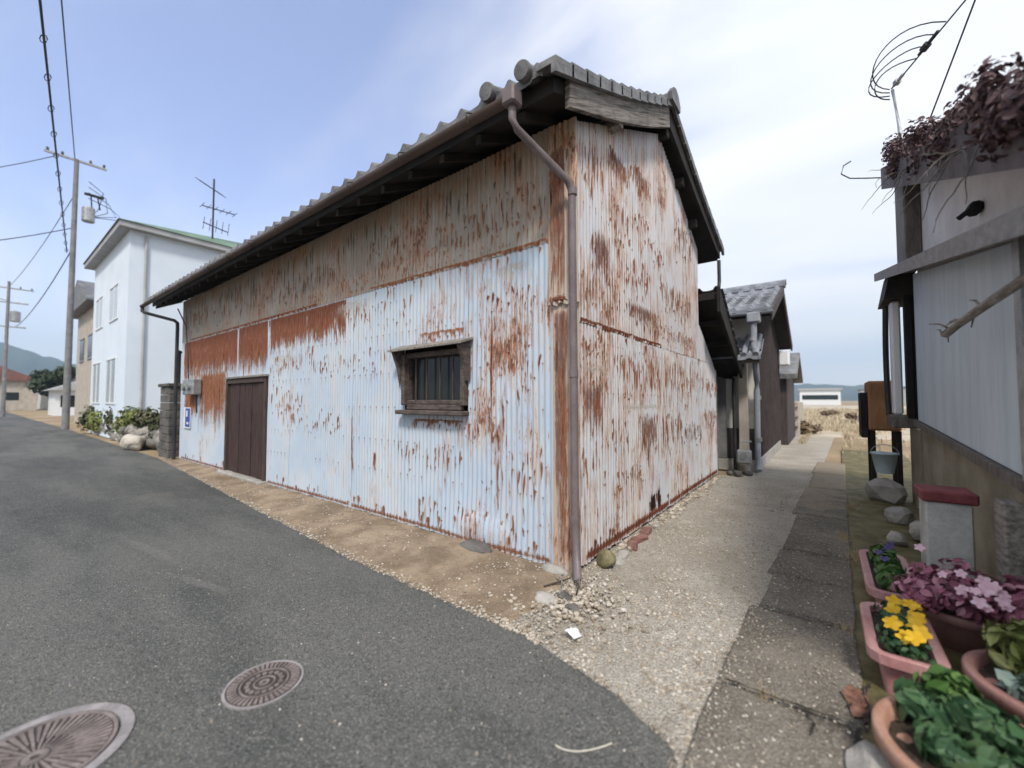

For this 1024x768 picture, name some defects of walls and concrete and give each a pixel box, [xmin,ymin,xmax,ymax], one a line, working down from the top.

rust [184,149,568,564]
rust [581,143,717,490]
rust [586,469,717,559]